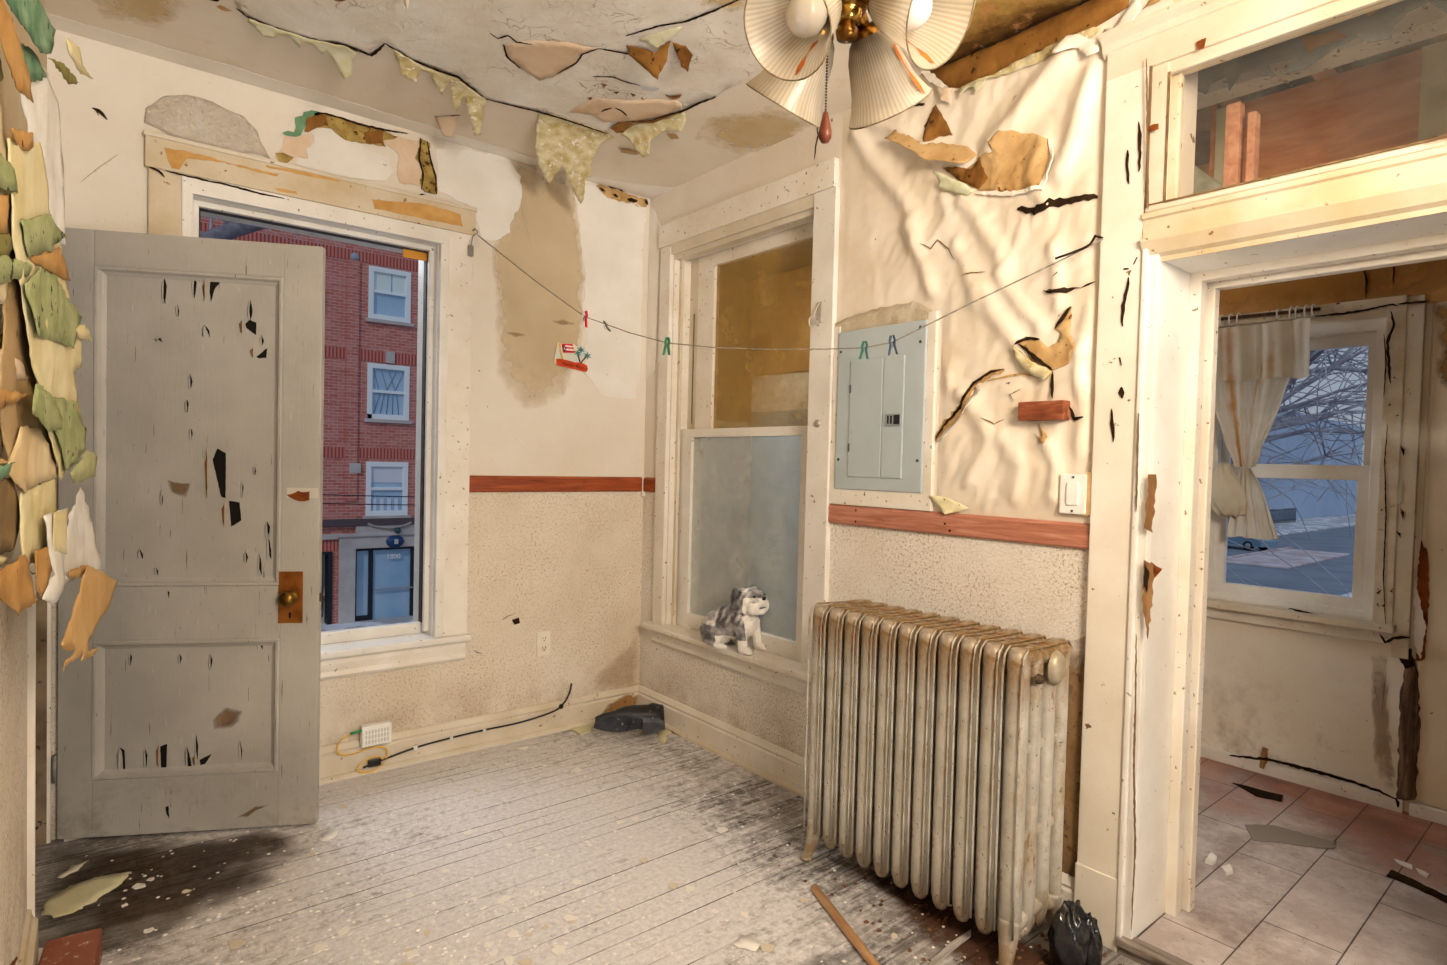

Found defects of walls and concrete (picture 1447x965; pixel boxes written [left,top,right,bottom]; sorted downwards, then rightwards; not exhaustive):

peeling [164,0,760,227]
crack [211,0,739,134]
crack [920,239,981,276]
peeling [1413,540,1429,661]